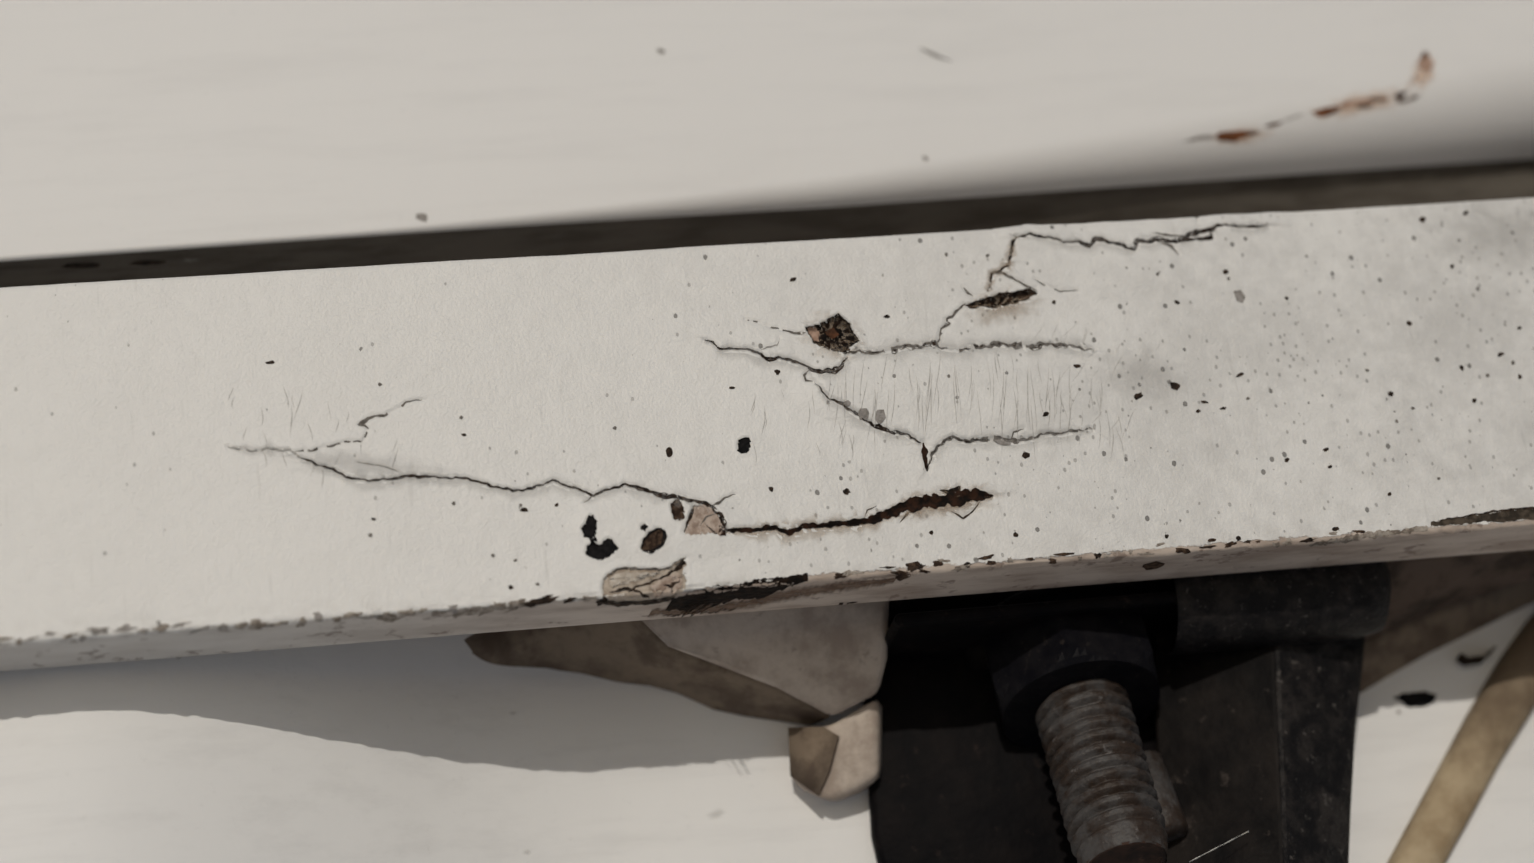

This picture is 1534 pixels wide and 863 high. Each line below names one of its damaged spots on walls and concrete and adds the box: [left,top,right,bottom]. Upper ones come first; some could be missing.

rust [1183,51,1434,142]
crack [987,224,1269,292]
hole [748,313,859,354]
crack [228,320,1092,536]
spalling [0,498,1101,645]
spalling [1128,507,1534,570]
peeling [1456,645,1496,669]